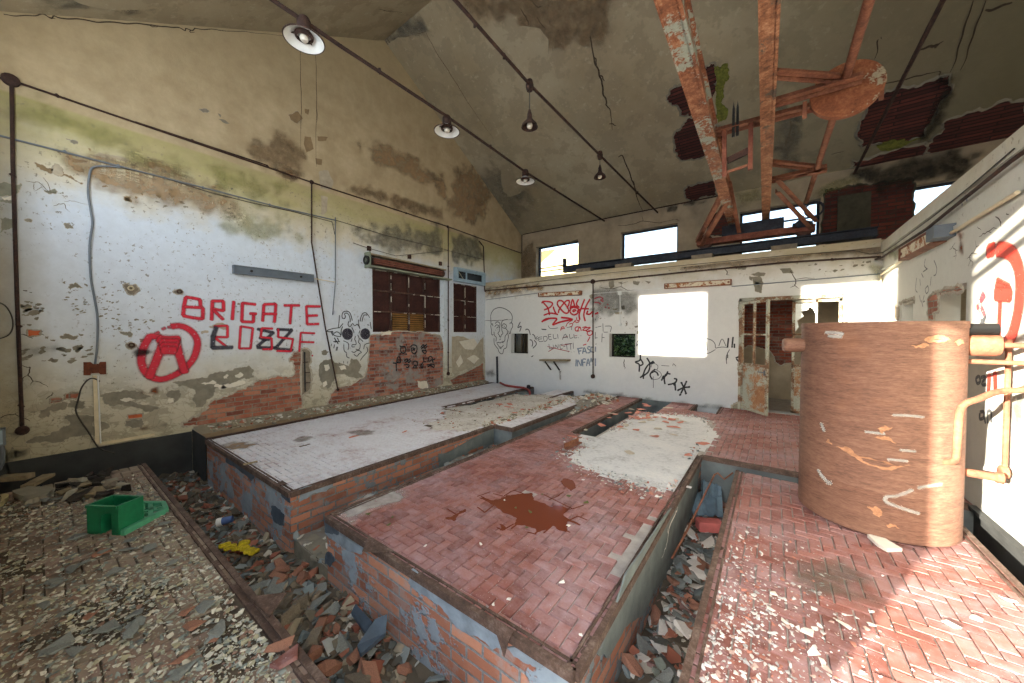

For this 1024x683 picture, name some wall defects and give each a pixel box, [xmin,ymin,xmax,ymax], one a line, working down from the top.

leakage [464,0,607,46]
crack [4,14,318,123]
crack [590,36,616,126]
spalling [666,84,705,162]
spalling [705,61,729,123]
spalling [850,73,1024,169]
leakage [66,154,236,214]
leakage [352,145,489,224]
mould [856,150,978,193]
leakage [372,227,482,263]
spalling [893,282,964,321]
spalling [100,330,485,429]